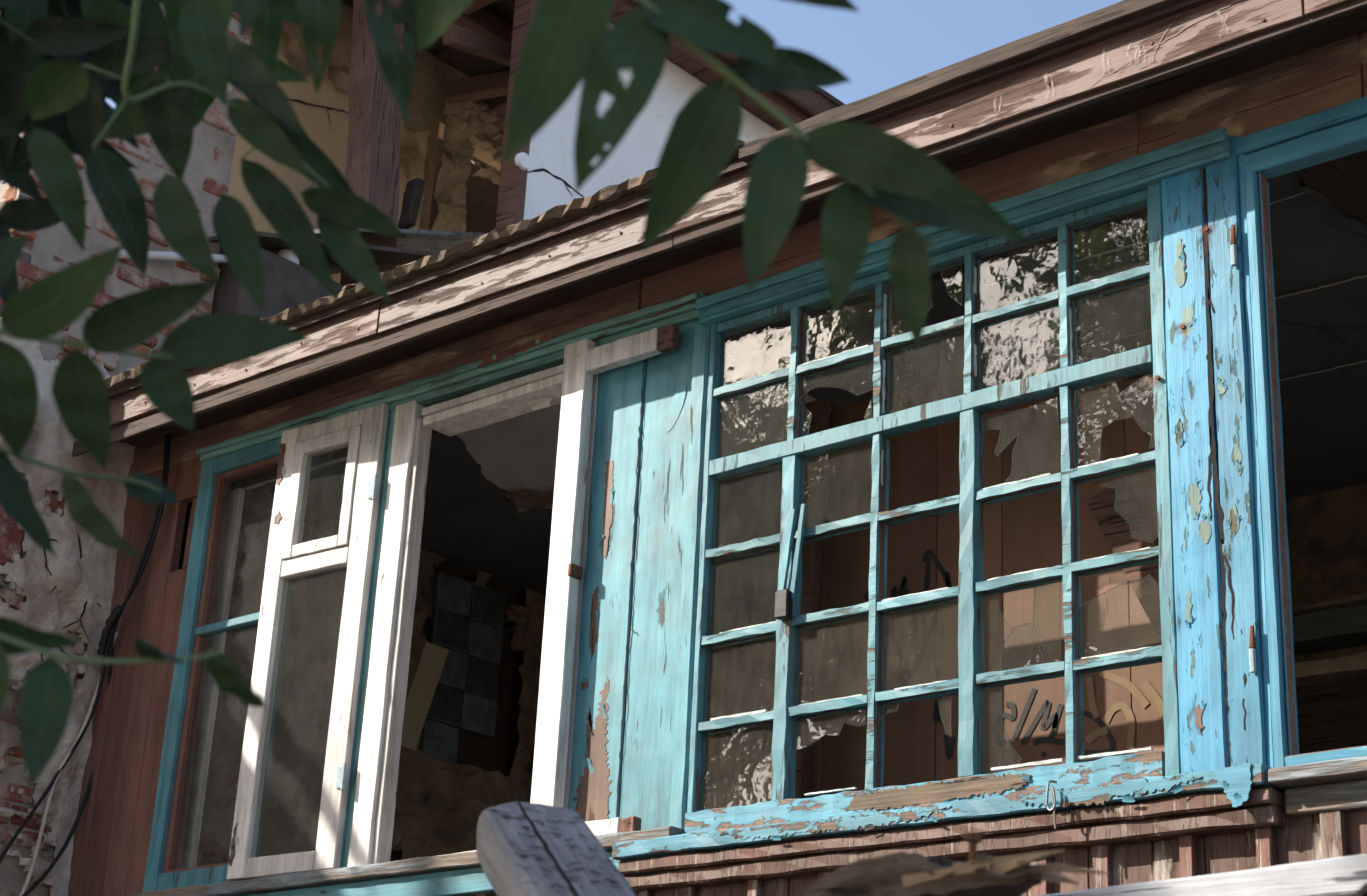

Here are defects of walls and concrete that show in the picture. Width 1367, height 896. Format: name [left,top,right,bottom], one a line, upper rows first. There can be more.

peeling [1174,237,1187,287]
peeling [1181,306,1195,336]
spalling [0,505,28,612]
peeling [456,396,561,513]
peeling [599,460,614,558]
peeling [719,352,832,458]
peeling [1174,418,1183,448]
peeling [1188,477,1240,544]
crack [1203,174,1247,767]
peeling [589,585,599,660]
peeling [572,678,612,822]
peeling [720,762,1253,840]